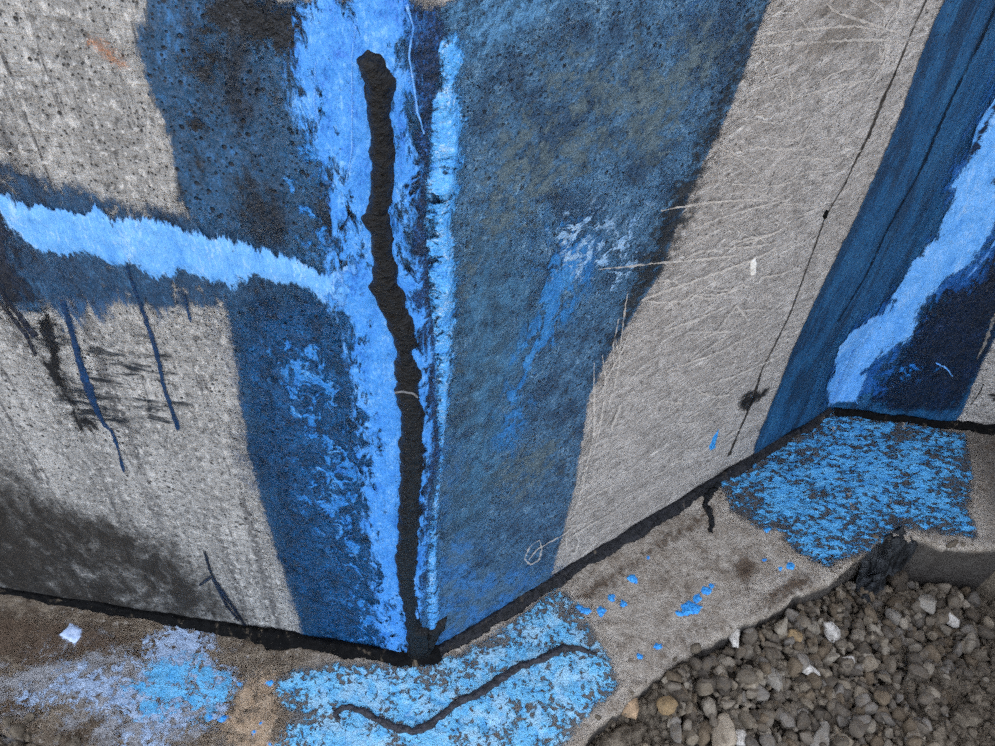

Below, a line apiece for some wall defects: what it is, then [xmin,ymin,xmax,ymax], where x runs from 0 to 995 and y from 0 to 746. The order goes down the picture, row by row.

crack [727,0,927,457]
crack [838,9,995,322]
crack [333,644,598,735]